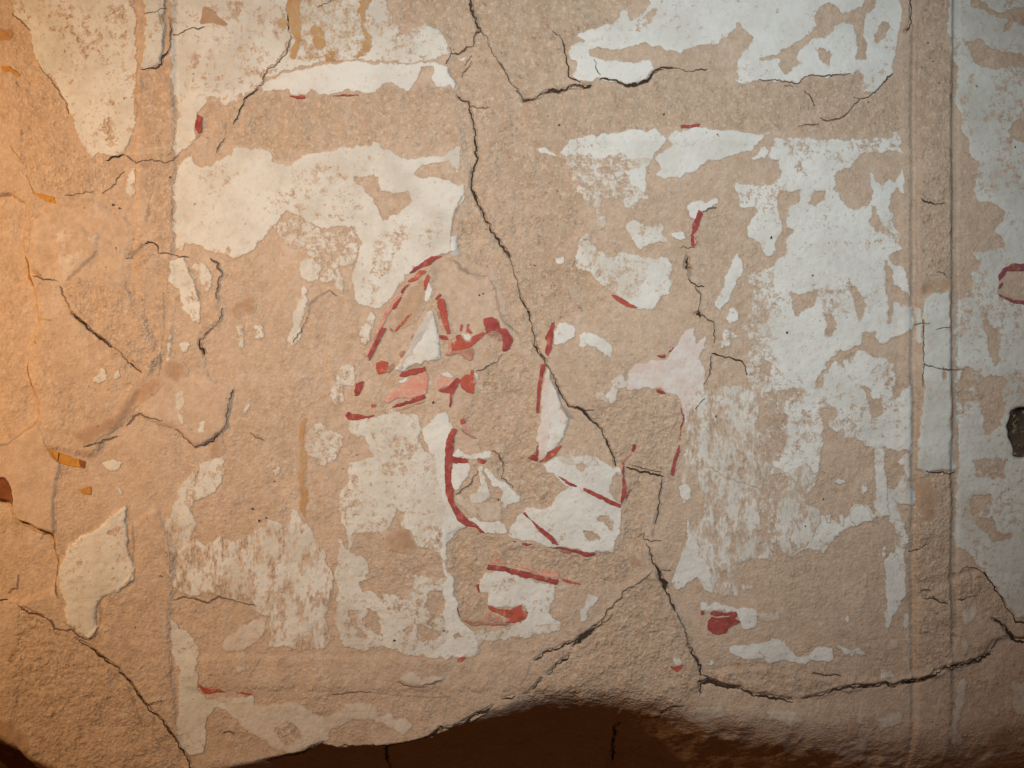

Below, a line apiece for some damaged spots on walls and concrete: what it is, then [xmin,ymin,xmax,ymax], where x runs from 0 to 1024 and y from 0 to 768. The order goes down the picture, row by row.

spalling [4,0,463,266]
crack [216,35,292,153]
peeling [56,226,86,277]
crack [34,275,141,372]
peeling [102,459,123,471]
spalling [59,267,173,384]
crack [83,389,234,448]
crack [126,241,223,354]
peeling [163,0,1024,709]
crack [269,0,1024,767]
crack [0,533,191,768]
spalling [5,486,413,768]